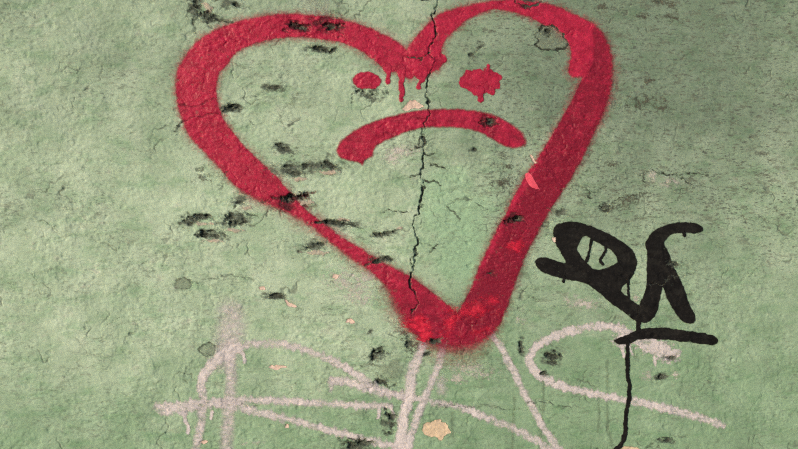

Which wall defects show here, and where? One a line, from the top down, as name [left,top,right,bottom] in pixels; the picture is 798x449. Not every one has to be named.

spalling [402,100,423,111]
crack [384,8,445,312]
spalling [422,419,451,440]